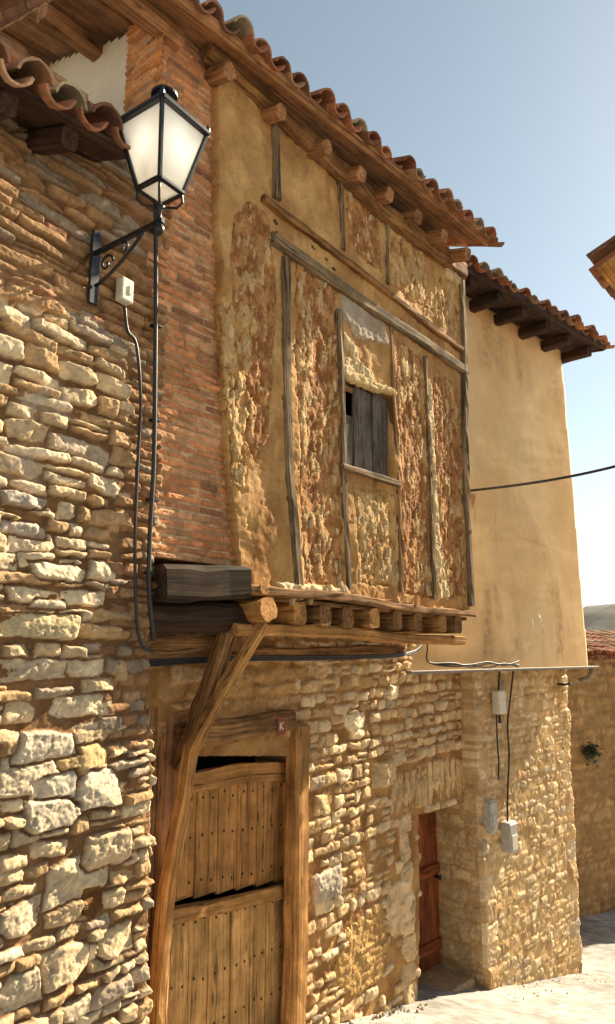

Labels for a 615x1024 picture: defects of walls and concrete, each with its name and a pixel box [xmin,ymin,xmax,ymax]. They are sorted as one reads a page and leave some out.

spalling [218,201,279,491]
spalling [289,264,466,606]
spalling [346,191,460,340]